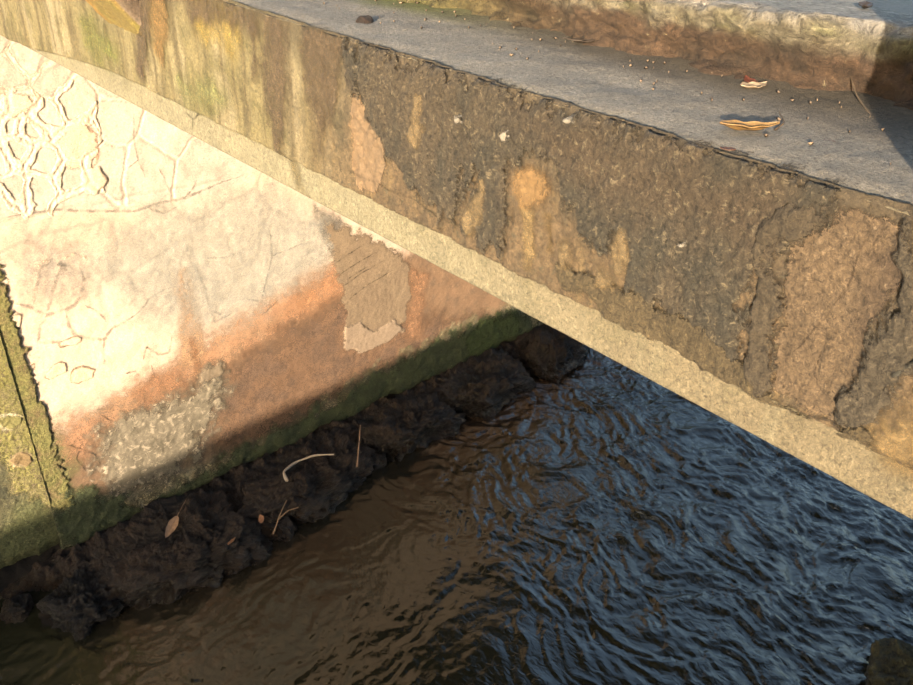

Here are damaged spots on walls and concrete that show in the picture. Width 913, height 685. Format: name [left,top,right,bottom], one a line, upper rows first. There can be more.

peeling [348,94,386,193]
crack [17,271,161,362]
corrosion [51,264,343,468]
damp [122,301,485,509]
peeling [321,220,412,354]
corrosion [406,269,429,339]
spalling [771,207,909,421]